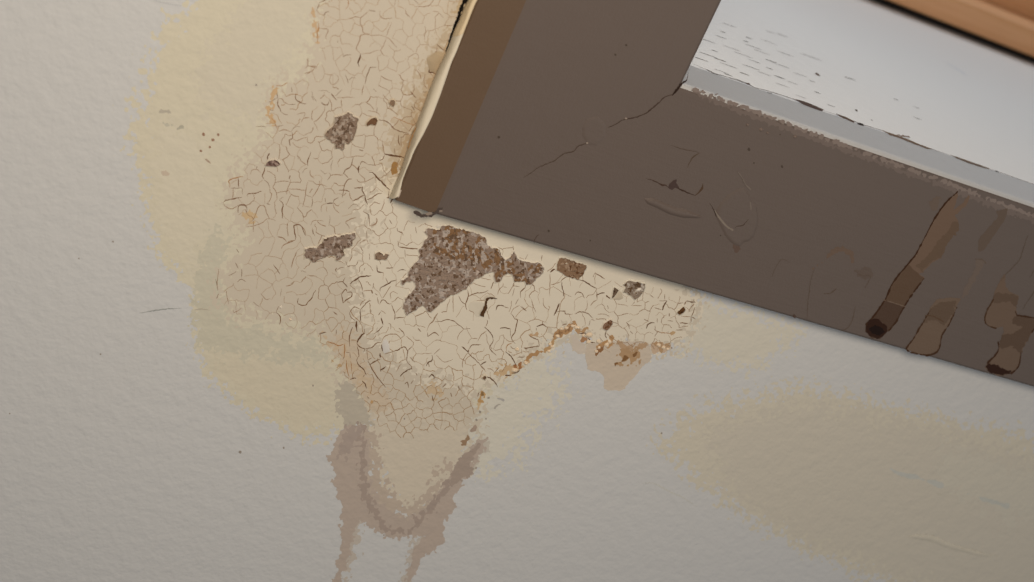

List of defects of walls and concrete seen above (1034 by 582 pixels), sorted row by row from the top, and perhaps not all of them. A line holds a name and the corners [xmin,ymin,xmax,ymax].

flaking render [324,111,379,151]
crack [608,24,882,131]
flaking render [303,231,357,263]
crack [195,0,713,475]
water stain [122,0,808,582]
flaking render [400,223,588,316]
water stain [865,191,970,339]
water stain [906,298,961,357]
water stain [984,239,1034,376]
water stain [646,375,1034,582]